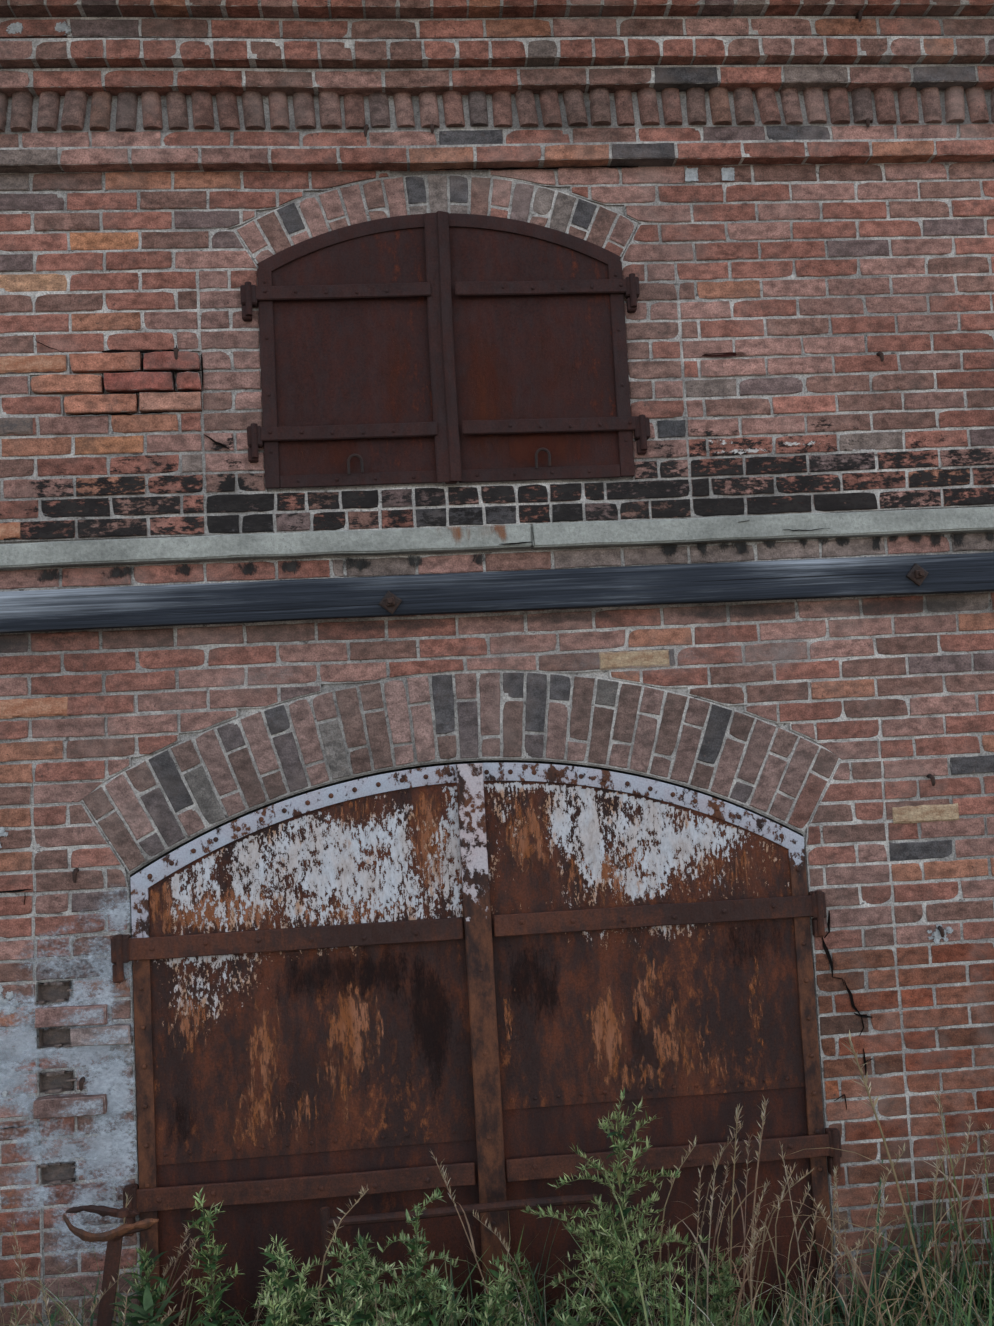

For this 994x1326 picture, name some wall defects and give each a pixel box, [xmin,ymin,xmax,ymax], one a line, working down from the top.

corrosion [150,883,407,932]
peeling [166,786,463,935]
corrosion [506,796,680,903]
peeling [484,781,790,914]
spalling [35,981,73,1005]
spalling [39,1026,75,1048]
spalling [39,1070,77,1094]
peeling [154,946,361,1045]
corrosion [227,1001,317,1146]
corrosion [317,983,384,1119]
corrosion [586,955,727,1088]
crack [822,911,873,1110]